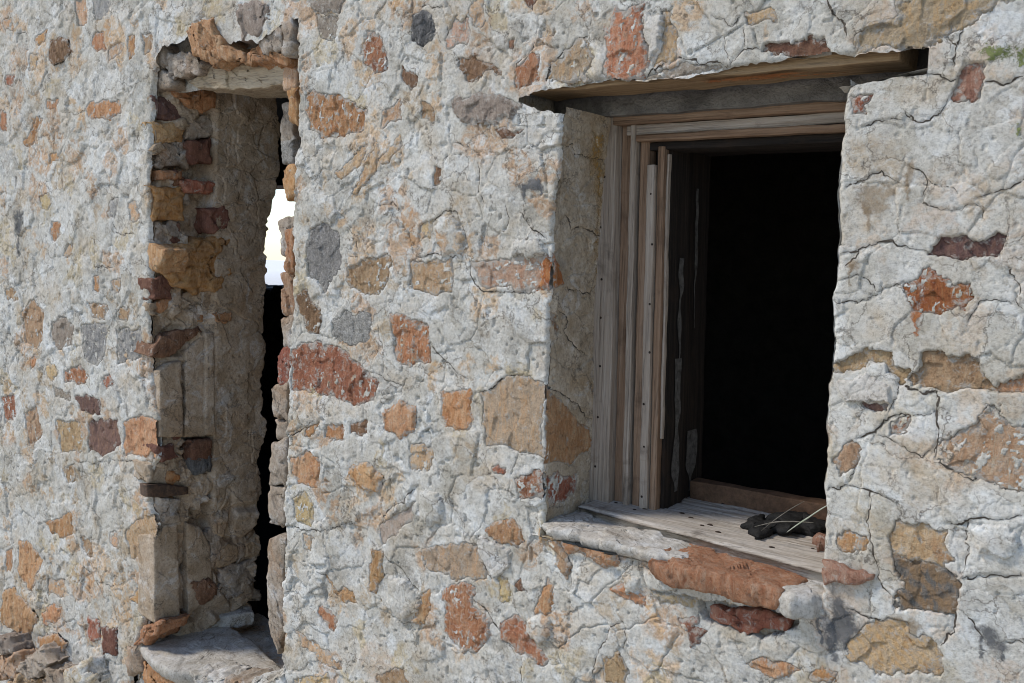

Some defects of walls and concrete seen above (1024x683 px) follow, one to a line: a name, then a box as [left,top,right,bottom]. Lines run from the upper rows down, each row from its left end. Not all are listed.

crack [866,31,963,126]
crack [986,76,1023,86]
crack [457,142,548,240]
crack [847,167,1024,218]
crack [419,210,533,294]
crack [836,239,927,304]
crack [968,268,1023,320]
crack [858,385,1006,490]
crack [828,469,902,621]
crack [950,515,1022,580]
crack [590,622,626,678]
crack [941,609,983,645]